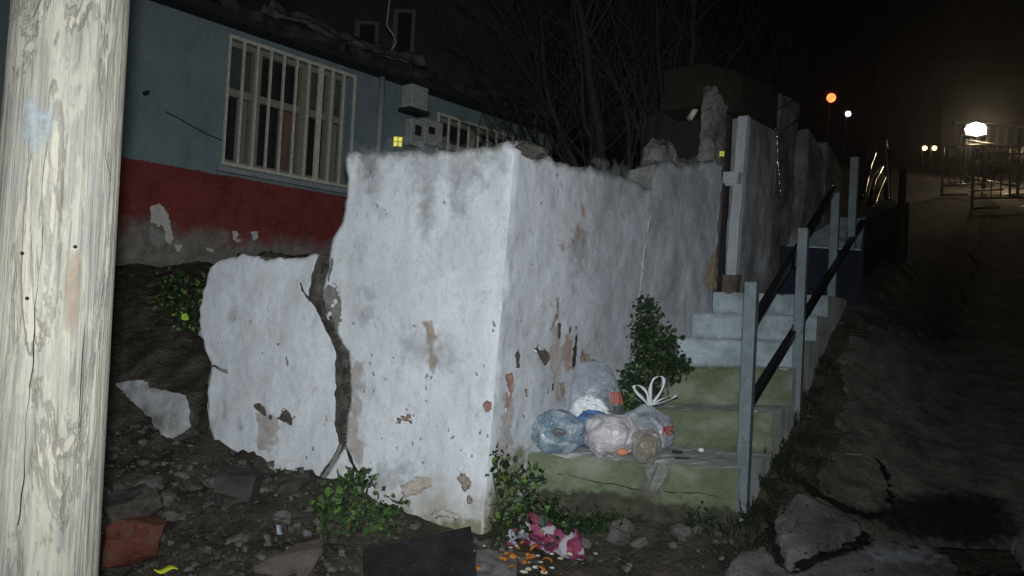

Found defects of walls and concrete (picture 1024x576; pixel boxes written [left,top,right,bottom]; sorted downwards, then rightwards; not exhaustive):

peeling [147,203,182,252]
peeling [324,258,354,332]
crack [300,259,372,490]
peeling [505,350,528,412]
peeling [534,296,566,400]
spalling [254,403,295,452]
spalling [396,408,414,424]
spalling [400,461,432,508]
spalling [431,471,473,520]
crack [764,458,896,570]